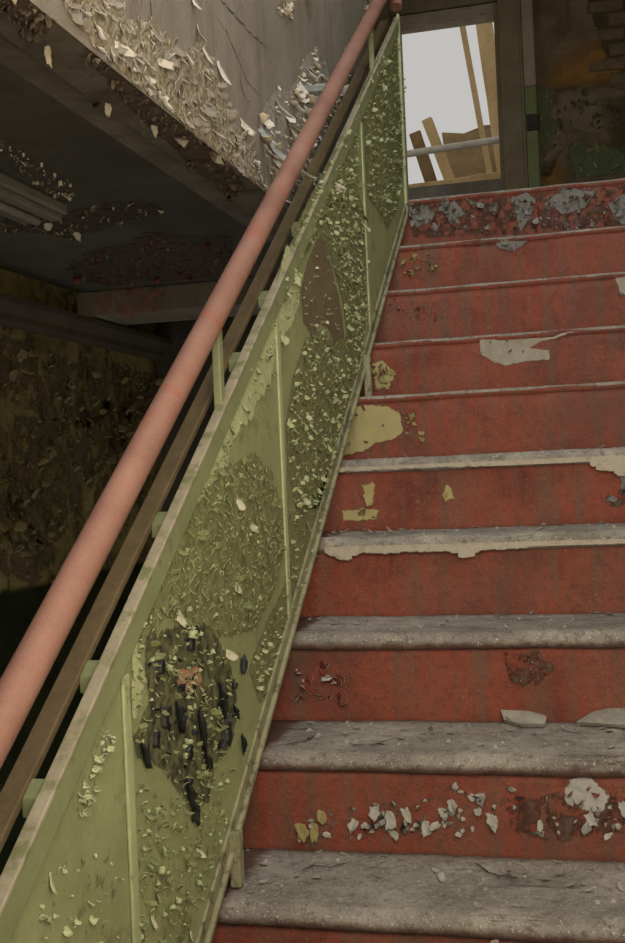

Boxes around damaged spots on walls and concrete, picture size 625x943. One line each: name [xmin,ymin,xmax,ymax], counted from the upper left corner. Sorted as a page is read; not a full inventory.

flaking render [63,0,331,203]
flaking render [0,135,165,243]
flaking render [67,232,234,288]
peeling [104,359,164,465]
peeling [89,474,110,516]
peeling [118,488,147,538]
peeling [131,38,625,943]
peeling [77,730,116,819]
peeling [37,853,125,943]